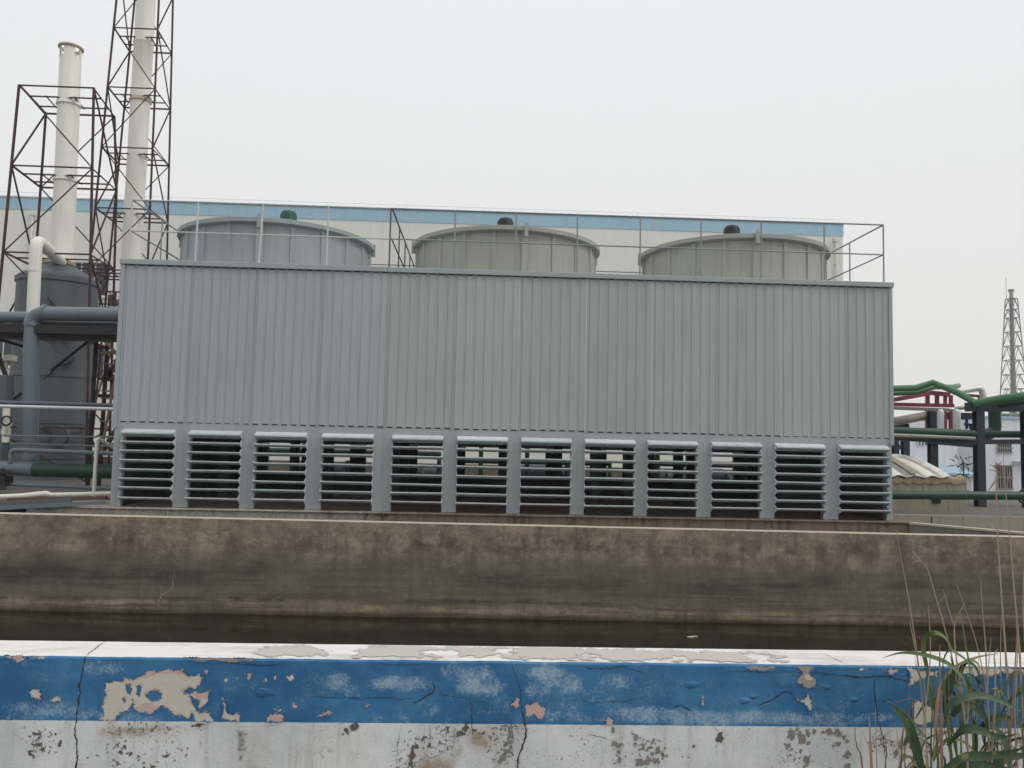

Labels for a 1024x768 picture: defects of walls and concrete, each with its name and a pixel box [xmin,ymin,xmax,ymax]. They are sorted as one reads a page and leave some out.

crack [74,641,107,768]
peeling [99,644,333,727]
crack [512,648,527,768]
peeling [510,698,546,720]
peeling [344,645,816,711]
peeling [888,667,939,688]
spalling [28,732,62,758]
spalling [408,736,431,768]
spalling [446,723,485,737]
spalling [497,724,517,765]
spalling [605,718,666,768]
spalling [784,727,852,768]